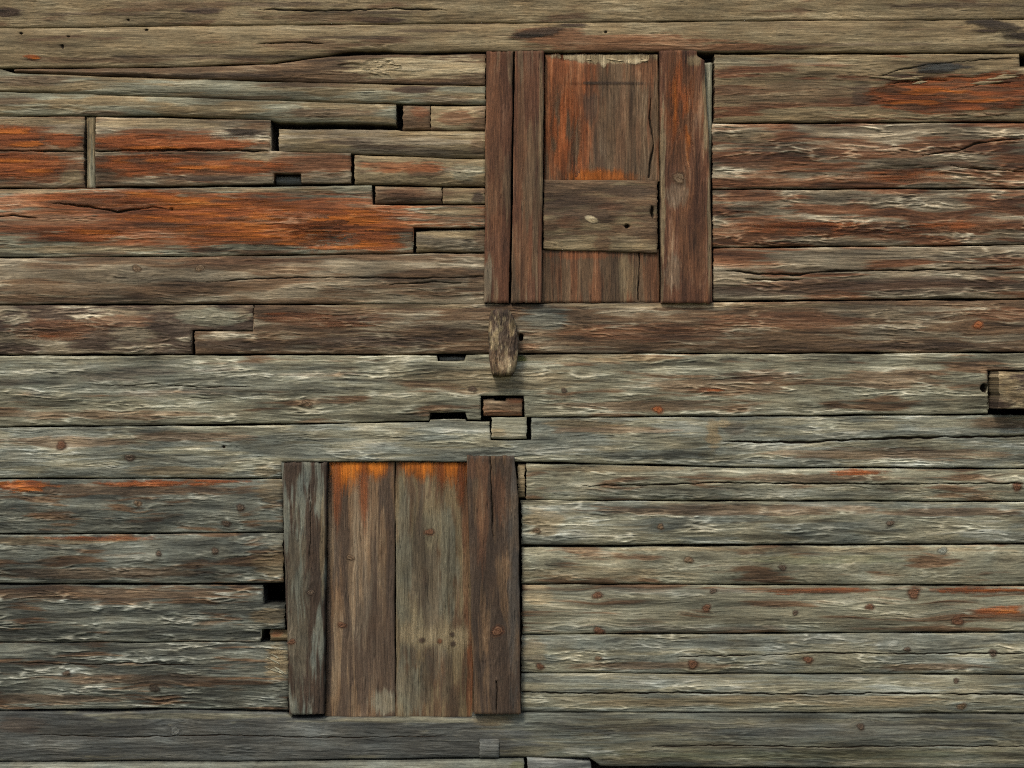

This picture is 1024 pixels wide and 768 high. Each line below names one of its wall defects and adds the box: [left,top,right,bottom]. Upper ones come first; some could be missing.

crack [883,58,1019,84]
rust [571,170,623,180]
crack [0,203,164,218]
rust [332,462,387,517]
rust [402,462,467,500]